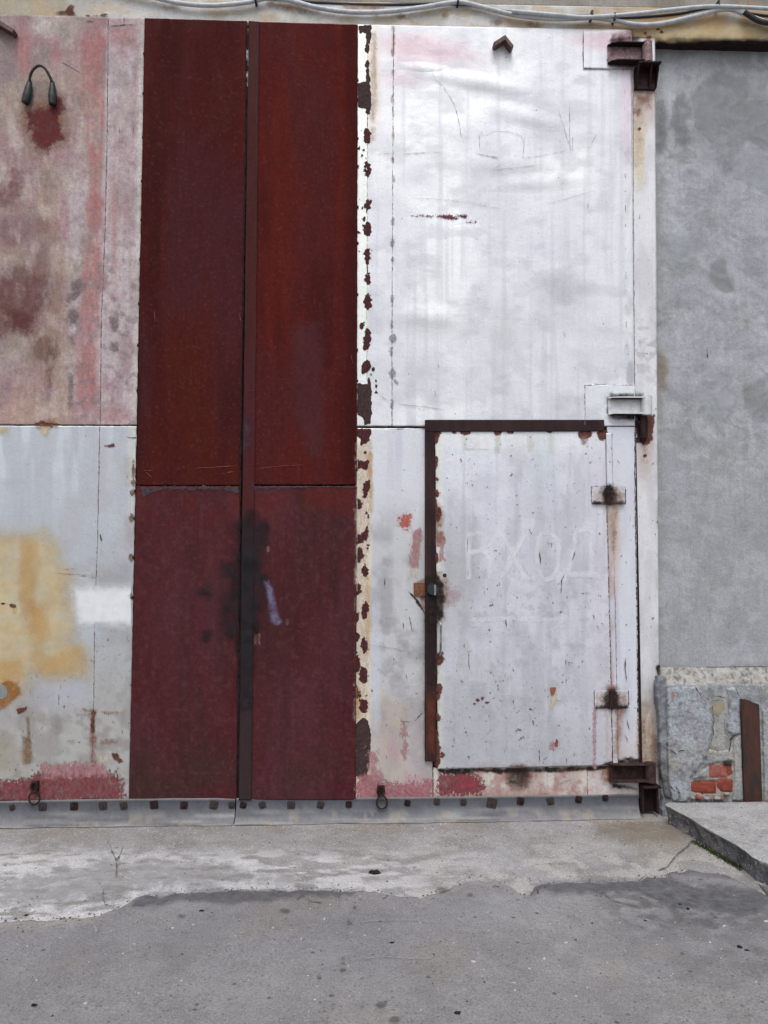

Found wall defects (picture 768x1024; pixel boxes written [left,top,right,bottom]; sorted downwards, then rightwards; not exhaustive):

rust [21,97,65,151]
peeling [358,25,373,177]
peeling [140,486,239,497]
peeling [254,199,486,800]
rust [419,428,651,789]
crack [666,666,768,751]
peeling [0,761,128,801]
spalling [690,761,734,801]